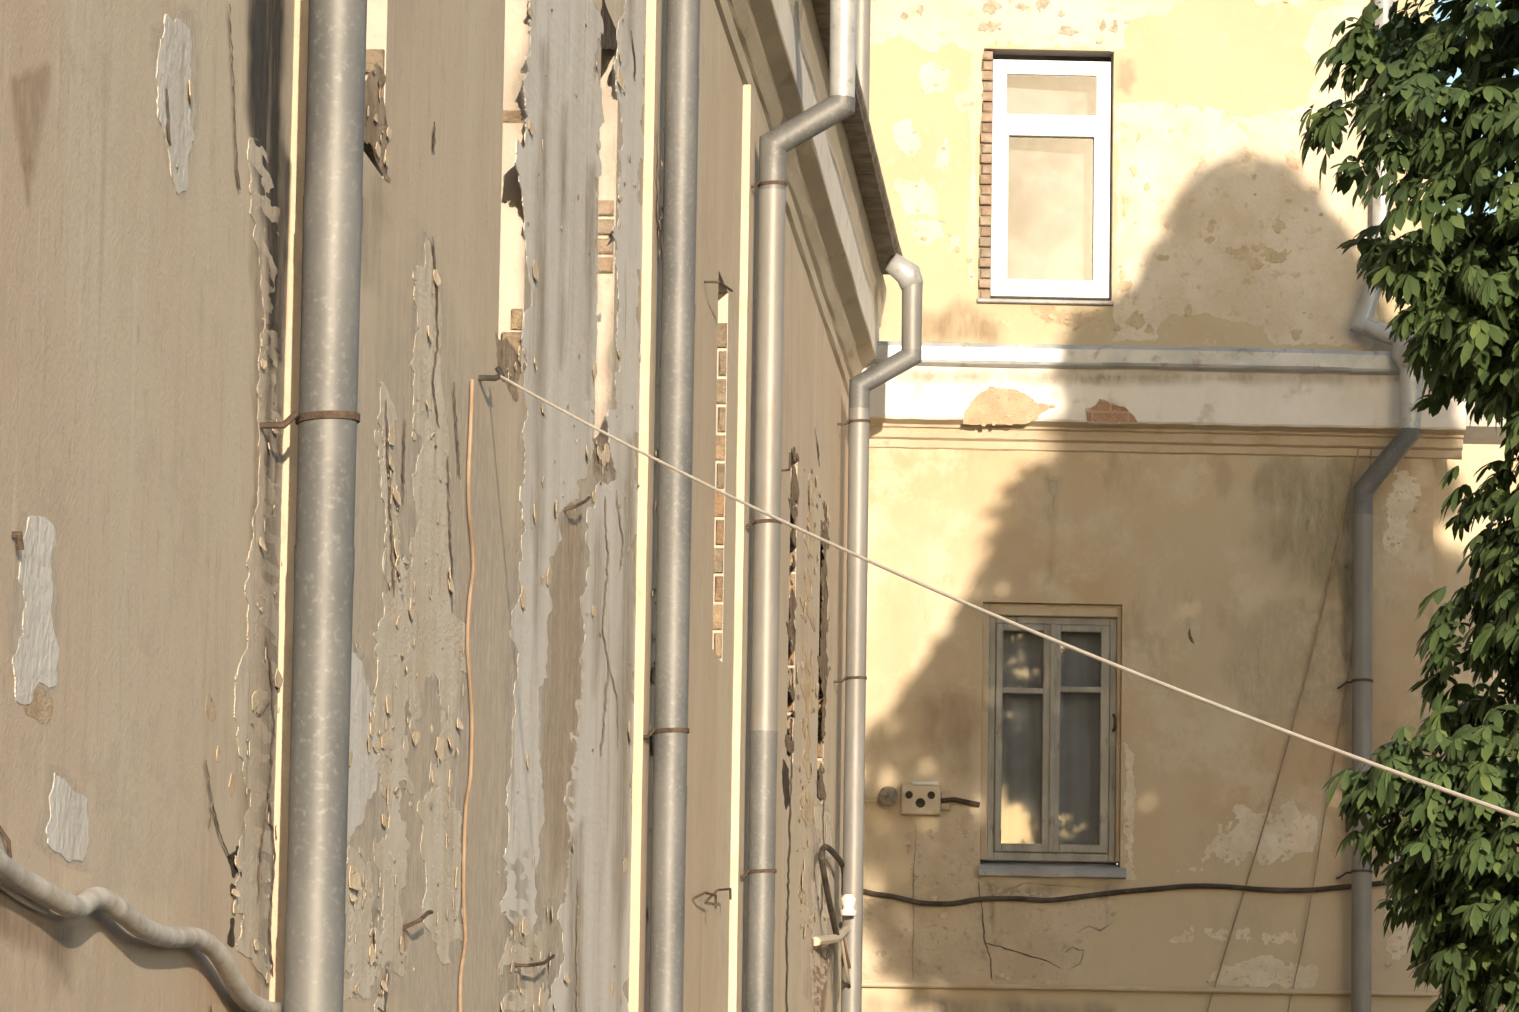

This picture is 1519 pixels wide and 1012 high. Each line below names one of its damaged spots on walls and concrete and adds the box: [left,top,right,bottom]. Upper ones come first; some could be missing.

peeling [156,14,198,194]
peeling [870,0,1184,288]
peeling [1029,0,1375,350]
peeling [495,0,663,1012]
flaking render [963,386,1056,426]
peeling [12,516,59,724]
peeling [43,772,89,866]
peeling [343,240,467,1012]
peeling [782,446,833,1012]
crack [910,827,918,981]
crack [978,882,1111,982]
peeling [1177,799,1321,872]